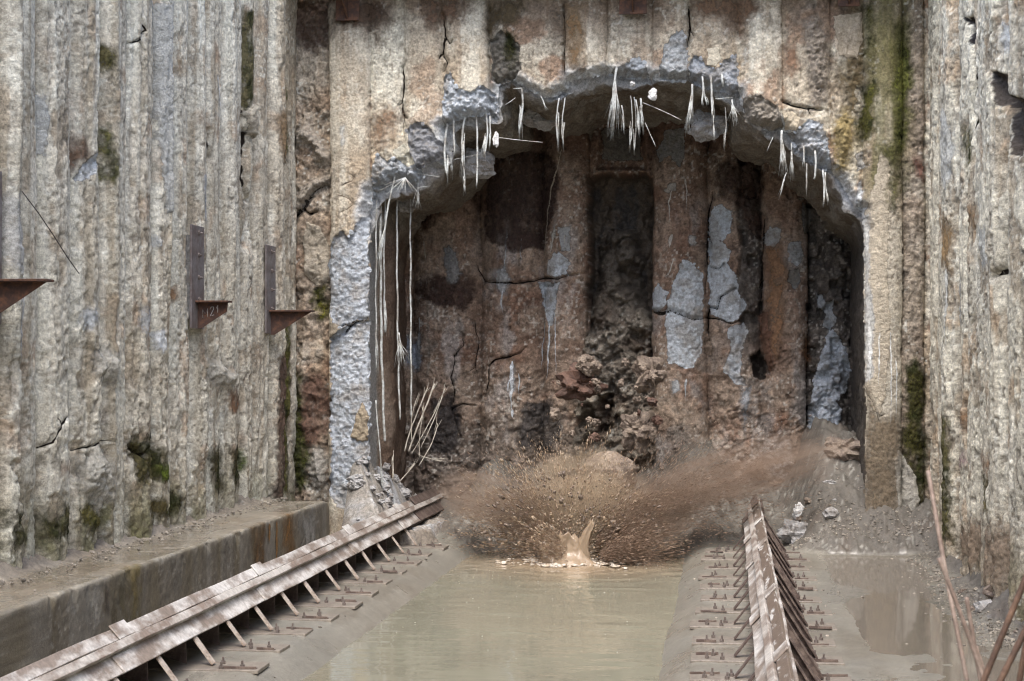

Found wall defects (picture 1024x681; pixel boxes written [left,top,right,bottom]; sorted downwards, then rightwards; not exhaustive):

crack [439,15,452,67]
leakage [838,58,863,115]
crack [297,185,326,217]
crack [477,265,586,287]
spalling [303,30,891,509]
crack [450,323,525,424]
crack [36,417,146,459]